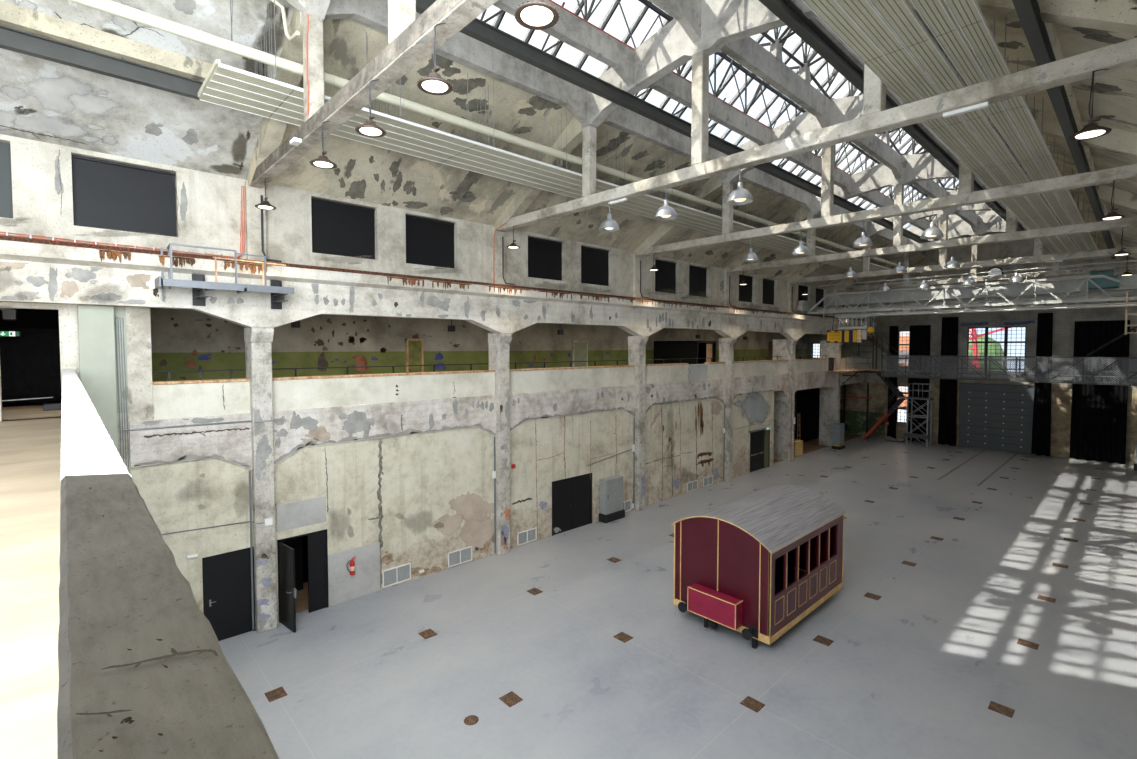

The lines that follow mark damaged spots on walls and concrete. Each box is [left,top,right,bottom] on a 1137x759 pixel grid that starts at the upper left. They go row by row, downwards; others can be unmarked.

peeling [336,160,375,199]
peeling [384,158,417,205]
corrosion [98,249,131,263]
corrosion [159,255,195,267]
corrosion [224,261,271,274]
flaking render [432,492,510,553]